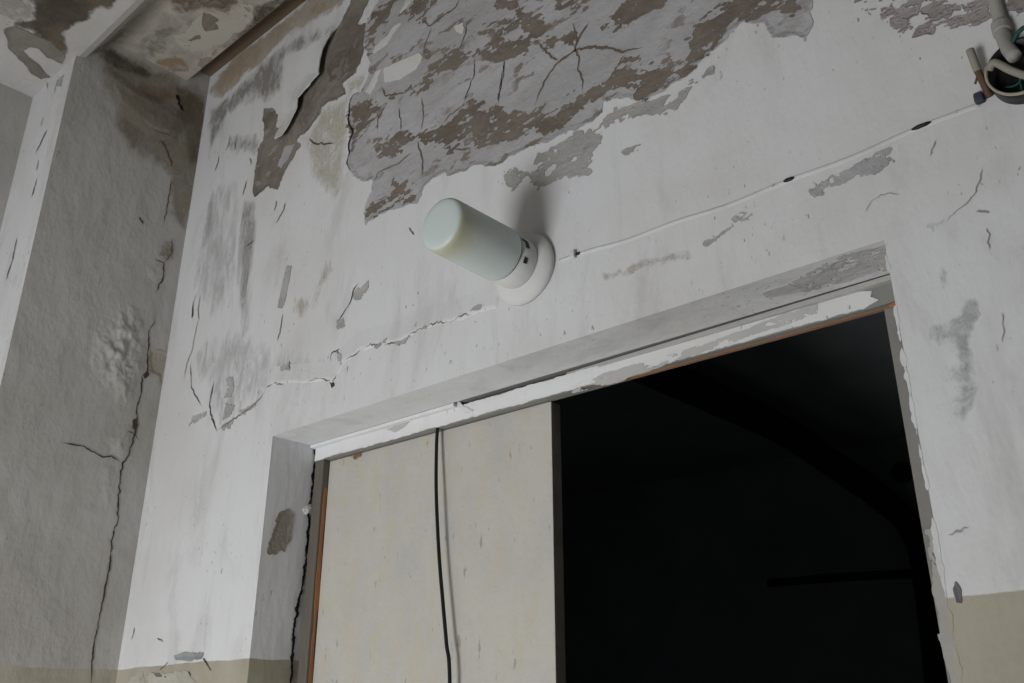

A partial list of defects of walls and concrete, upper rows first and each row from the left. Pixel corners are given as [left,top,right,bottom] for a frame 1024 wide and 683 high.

flaking render [4,26,66,87]
flaking render [854,0,992,38]
flaking render [252,0,814,225]
flaking render [808,147,895,198]
crack [948,171,990,250]
crack [185,293,262,431]
crack [330,280,369,357]
flaking render [571,304,818,393]
crack [62,130,173,681]
spalling [267,508,294,555]
crack [290,449,315,683]